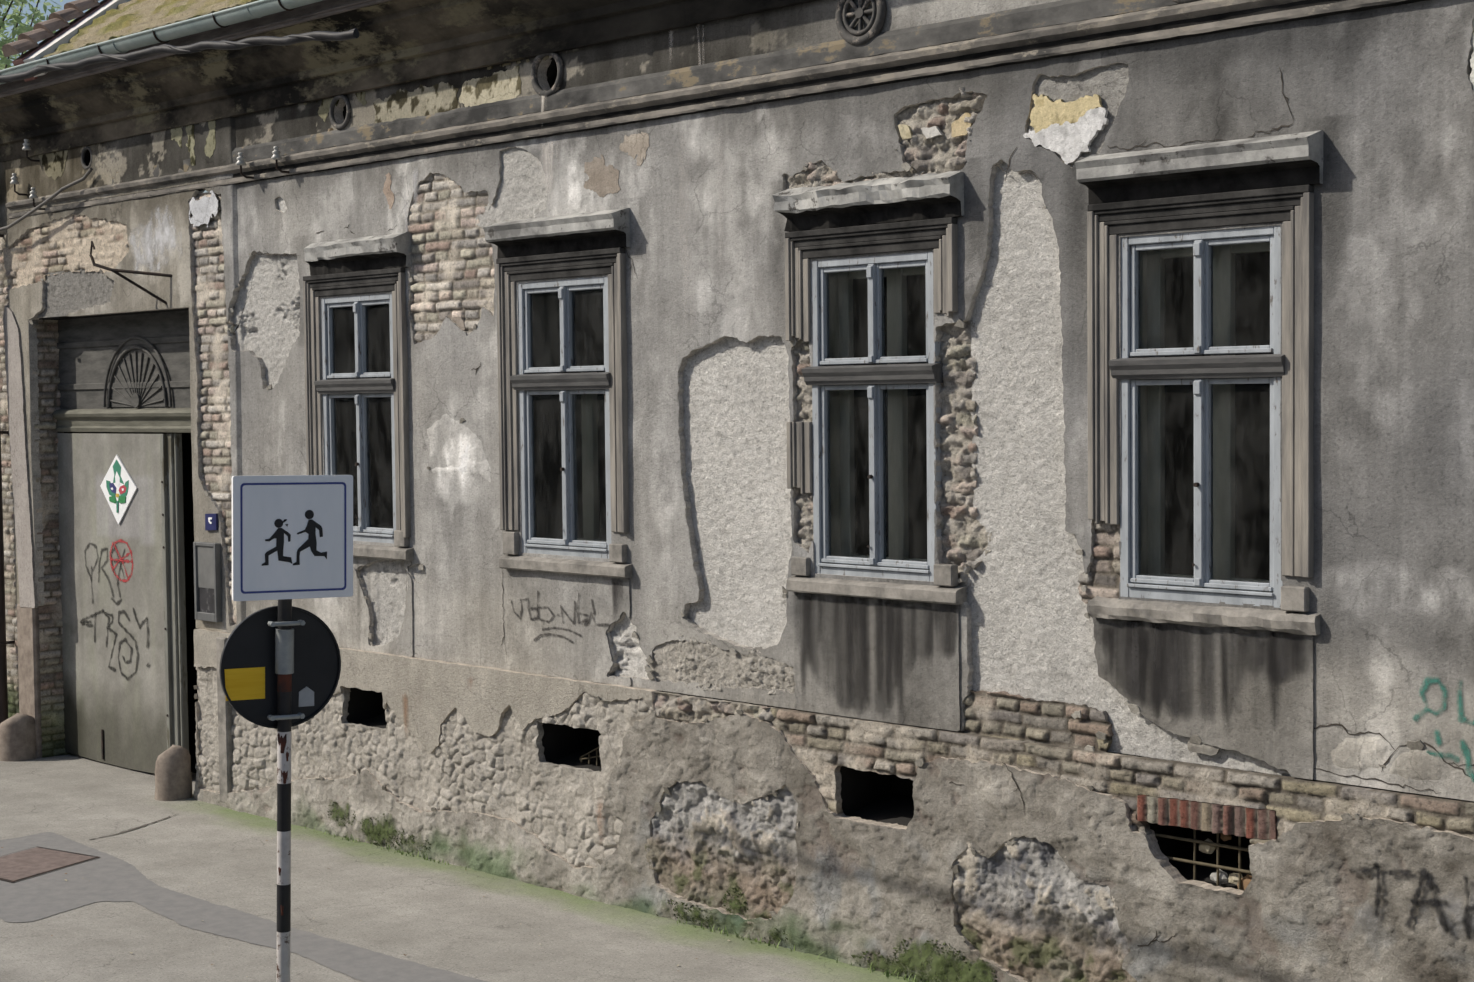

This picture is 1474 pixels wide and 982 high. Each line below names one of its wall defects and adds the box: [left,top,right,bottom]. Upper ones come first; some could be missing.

peeling [304,65,522,131]
flaking render [786,87,987,190]
flaking render [1023,63,1129,167]
flaking render [2,215,129,325]
flaking render [188,147,1474,868]
leakage [801,593,815,676]
leakage [837,596,902,707]
leakage [924,604,956,654]
leakage [1107,620,1227,716]
leakage [1254,632,1299,707]
crack [1314,723,1474,794]
flaking render [645,781,799,924]